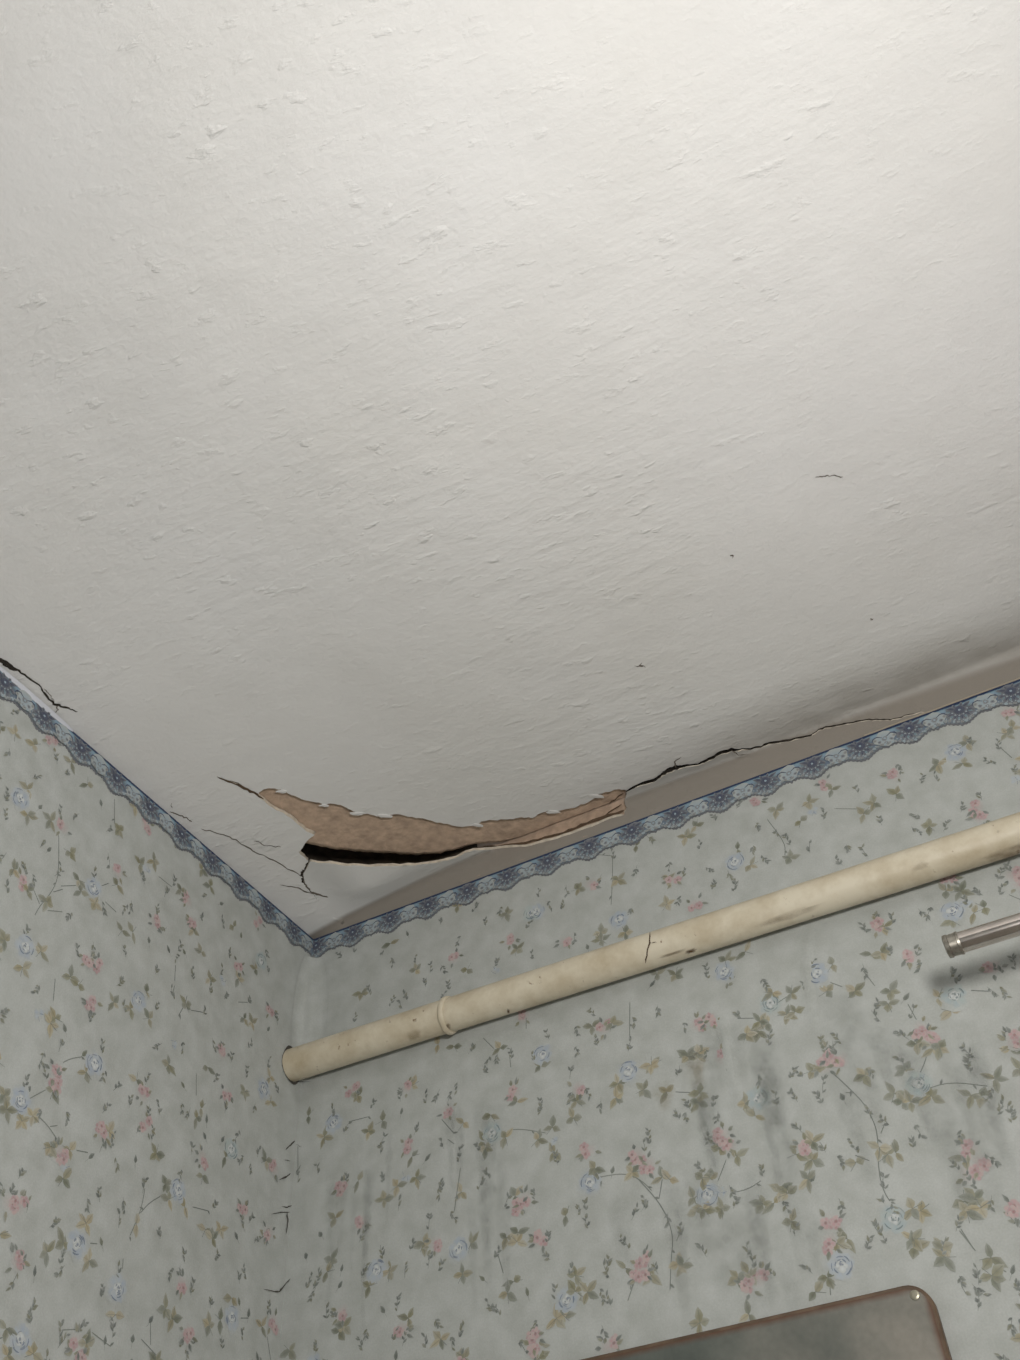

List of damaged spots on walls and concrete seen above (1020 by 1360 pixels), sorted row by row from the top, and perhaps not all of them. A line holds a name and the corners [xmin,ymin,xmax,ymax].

crack [0,658,78,712]
crack [626,712,918,792]
crack [171,806,327,897]
flaking render [218,777,627,865]